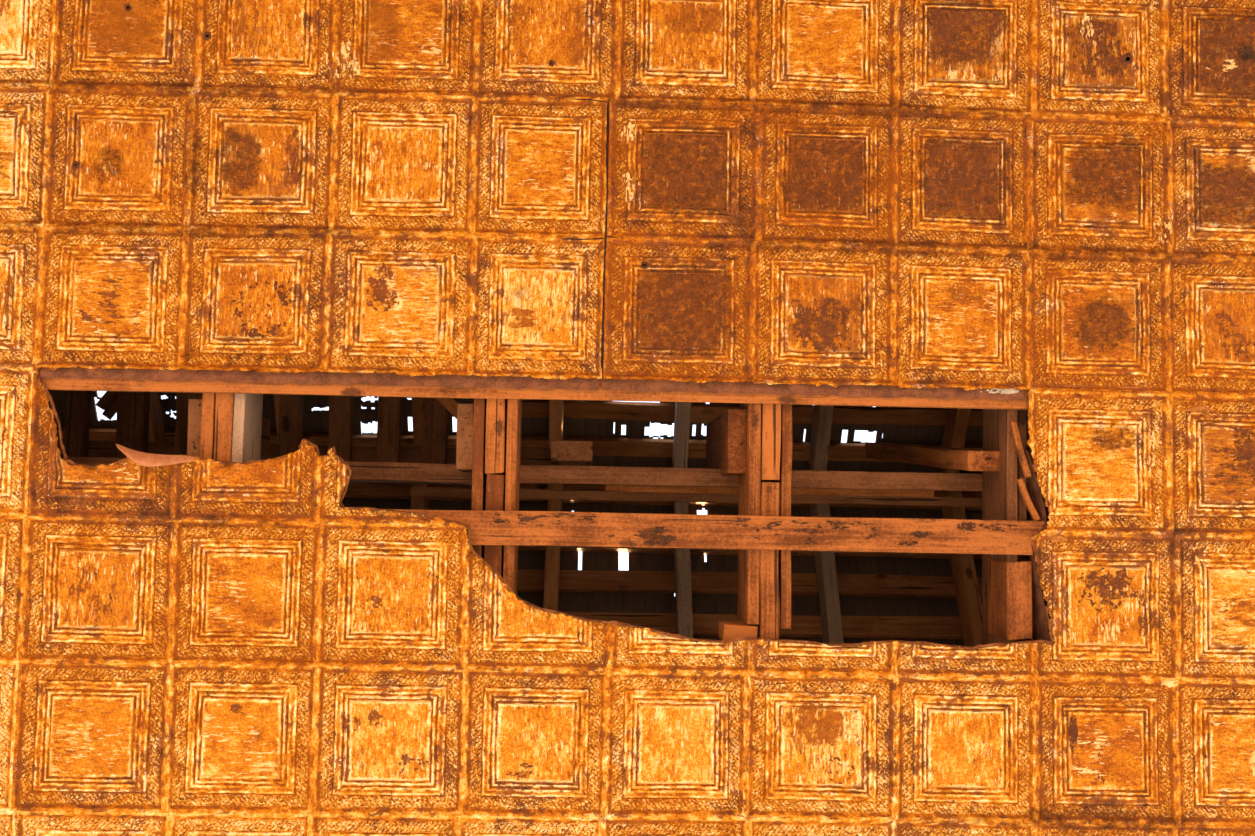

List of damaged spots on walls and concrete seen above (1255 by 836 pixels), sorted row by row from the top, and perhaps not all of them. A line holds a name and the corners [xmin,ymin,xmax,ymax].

rust [216,127,262,191]
rust [608,97,736,218]
rust [730,98,877,225]
rust [1068,137,1150,210]
rust [839,238,949,256]
rust [1091,246,1178,262]
rust [628,262,734,360]
rust [1075,296,1135,351]
peeling [755,526,824,544]
peeling [897,531,948,546]
peeling [957,522,1017,533]
peeling [69,566,116,615]